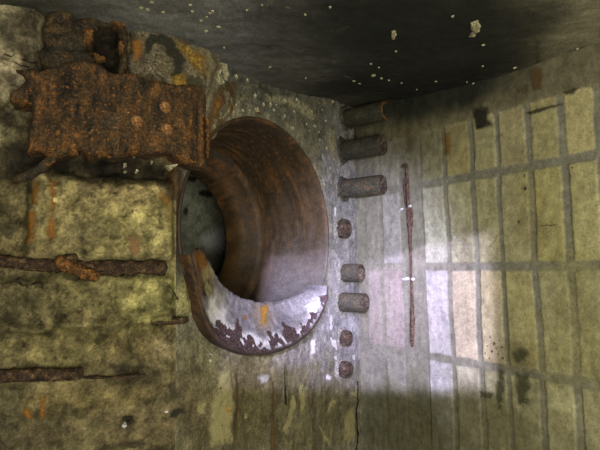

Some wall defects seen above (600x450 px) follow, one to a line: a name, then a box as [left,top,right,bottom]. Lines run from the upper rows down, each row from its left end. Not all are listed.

rust [172,83,244,165]
rust [378,175,387,194]
rust [342,219,352,238]
rust [0,253,168,282]
rust [356,264,365,282]
peeling [202,269,328,353]
rust [360,293,370,313]
rust [0,367,147,384]
water stain [480,371,504,409]
water stain [517,374,530,404]